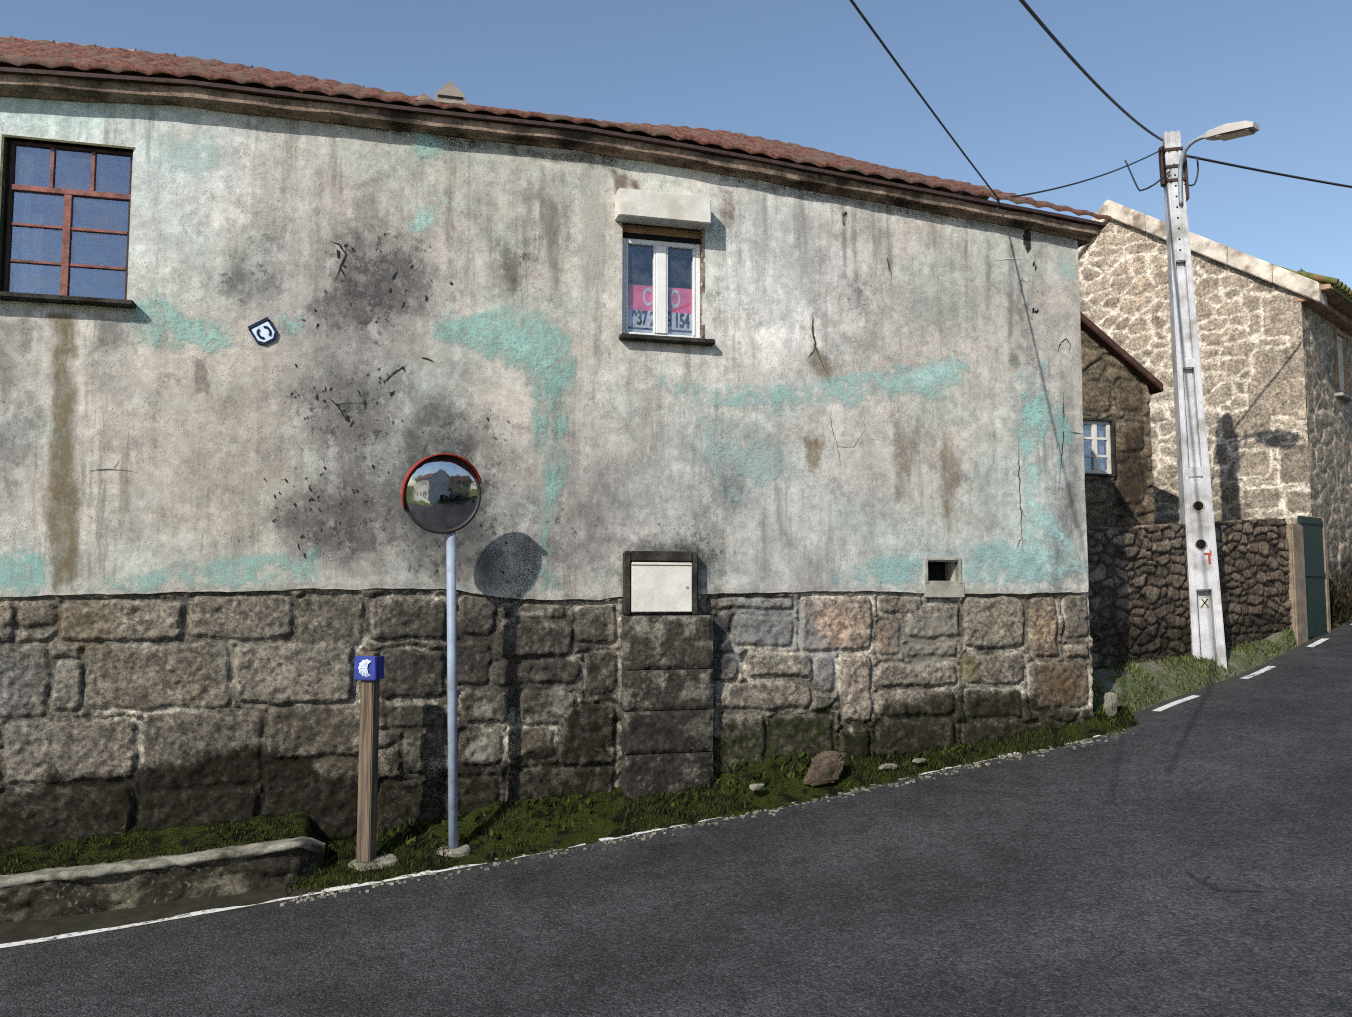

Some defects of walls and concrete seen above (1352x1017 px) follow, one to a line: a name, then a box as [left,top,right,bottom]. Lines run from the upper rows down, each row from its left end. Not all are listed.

leakage [302,227,432,328]
leakage [264,411,508,582]